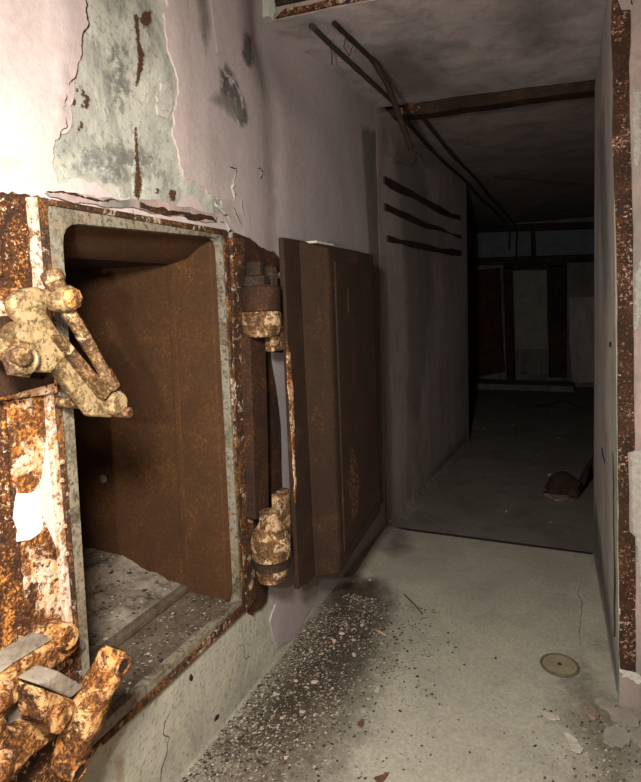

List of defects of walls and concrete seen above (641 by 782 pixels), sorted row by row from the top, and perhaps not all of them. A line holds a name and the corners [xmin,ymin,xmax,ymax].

peeling [44,0,247,233]
peeling [609,152,620,646]
peeling [629,449,641,601]
peeling [79,595,290,782]